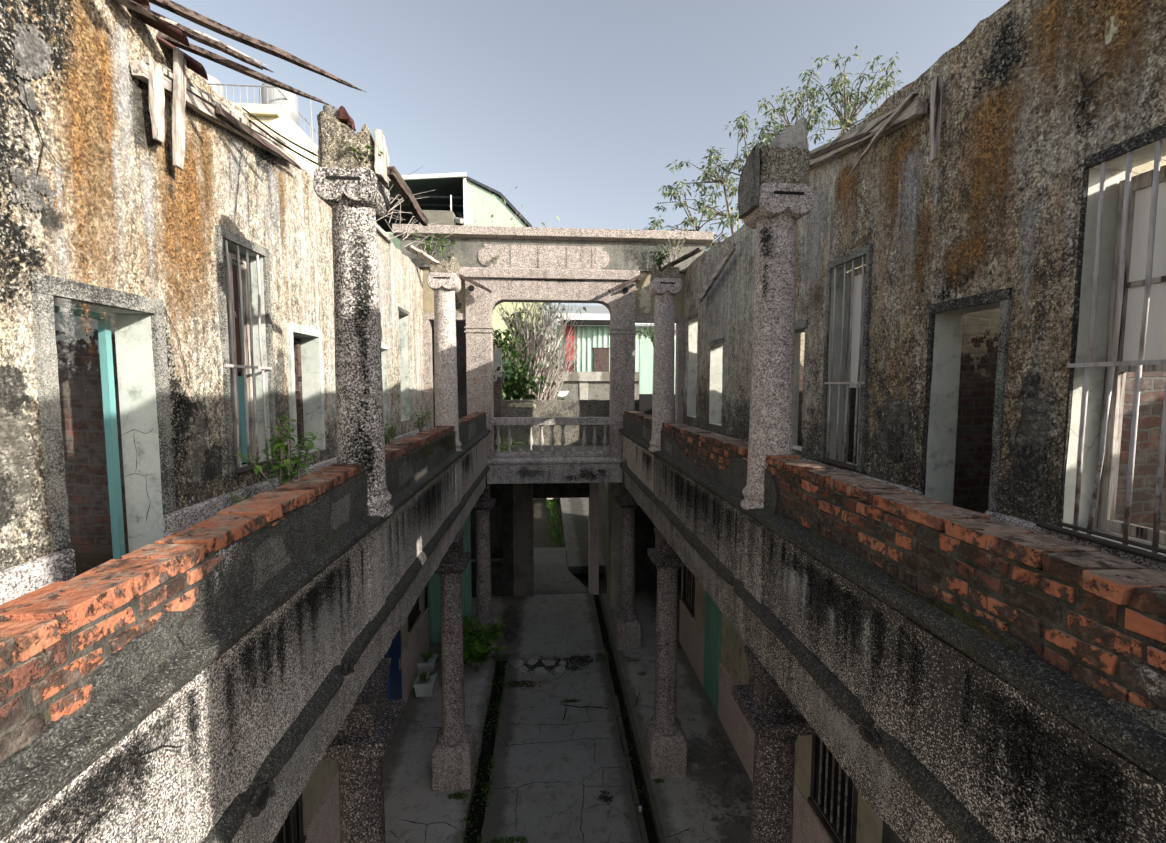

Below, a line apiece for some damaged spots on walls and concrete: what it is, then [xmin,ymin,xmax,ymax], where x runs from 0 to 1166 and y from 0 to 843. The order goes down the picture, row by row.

leakage [0,0,78,311]
leakage [113,28,131,238]
leakage [143,159,154,271]
leakage [971,0,1033,112]
leakage [1068,68,1113,142]
leakage [12,687,204,843]
leakage [207,543,242,596]
leakage [241,689,341,843]
leakage [221,548,364,792]
leakage [768,537,926,745]
leakage [956,670,1166,843]
leakage [1139,664,1166,695]